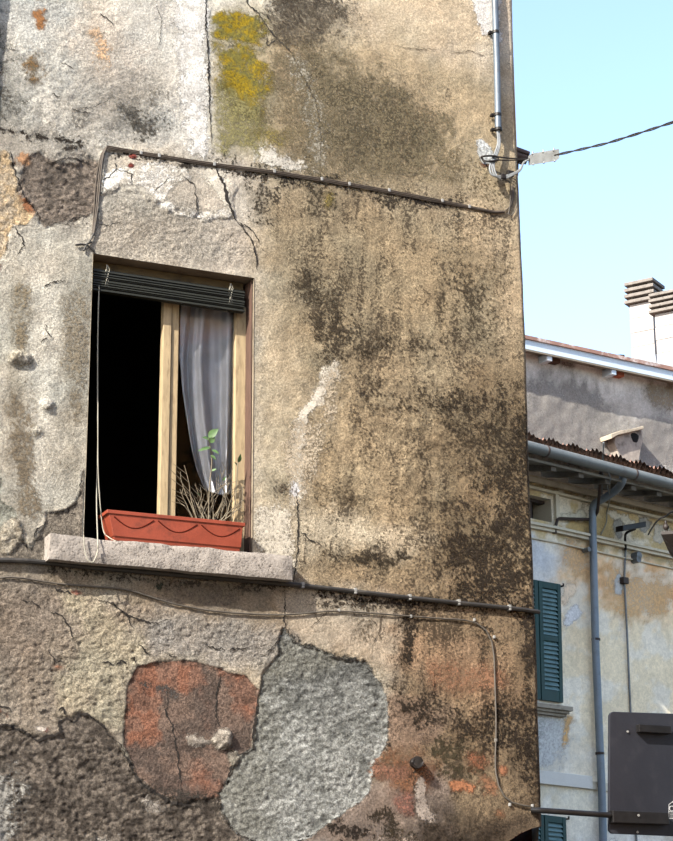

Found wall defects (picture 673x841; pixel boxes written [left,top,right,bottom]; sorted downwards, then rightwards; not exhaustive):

corrosion [32,8,46,30]
spalling [0,150,232,270]
crack [154,177,201,216]
crack [205,1,259,269]
crack [246,0,322,154]
leakage [109,0,517,227]
leakage [9,283,32,351]
leakage [0,392,42,531]
leakage [43,232,617,621]
leakage [639,419,673,469]
leakage [646,380,673,411]
spalling [0,660,260,841]